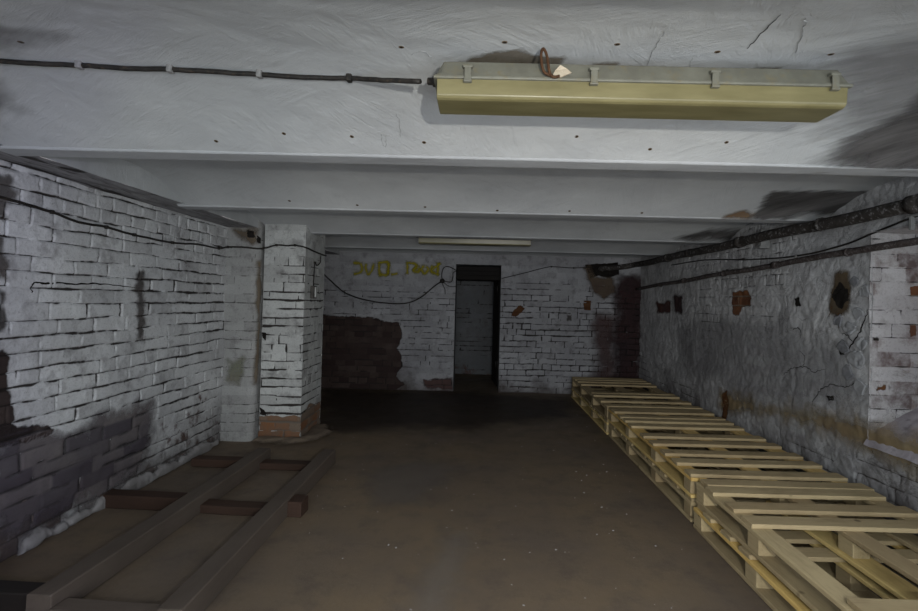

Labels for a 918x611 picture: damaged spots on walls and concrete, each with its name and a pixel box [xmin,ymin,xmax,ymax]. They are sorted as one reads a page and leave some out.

water stain [0,175,16,216]
water stain [0,237,8,277]
flaking render [656,300,671,313]
flaking render [732,290,751,316]
spalling [832,282,849,309]
crack [843,310,868,349]
flaking render [321,314,404,390]
flaking render [258,402,320,437]